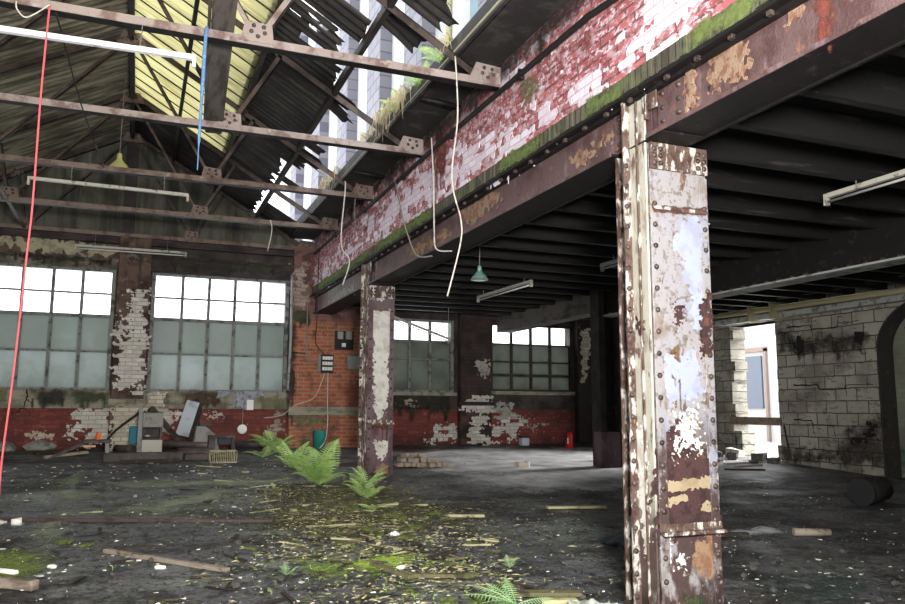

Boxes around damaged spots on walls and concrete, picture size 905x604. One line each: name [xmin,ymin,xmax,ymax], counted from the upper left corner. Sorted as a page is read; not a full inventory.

peeling [560,0,703,107]
corrosion [679,40,754,113]
corrosion [781,4,805,28]
corrosion [817,0,830,50]
peeling [288,93,557,310]
peeling [24,287,183,451]
peeling [368,298,390,420]
peeling [423,395,549,446]
peeling [664,349,707,466]
corrosion [649,375,724,580]
leakage [788,334,869,360]
leakage [782,417,887,467]